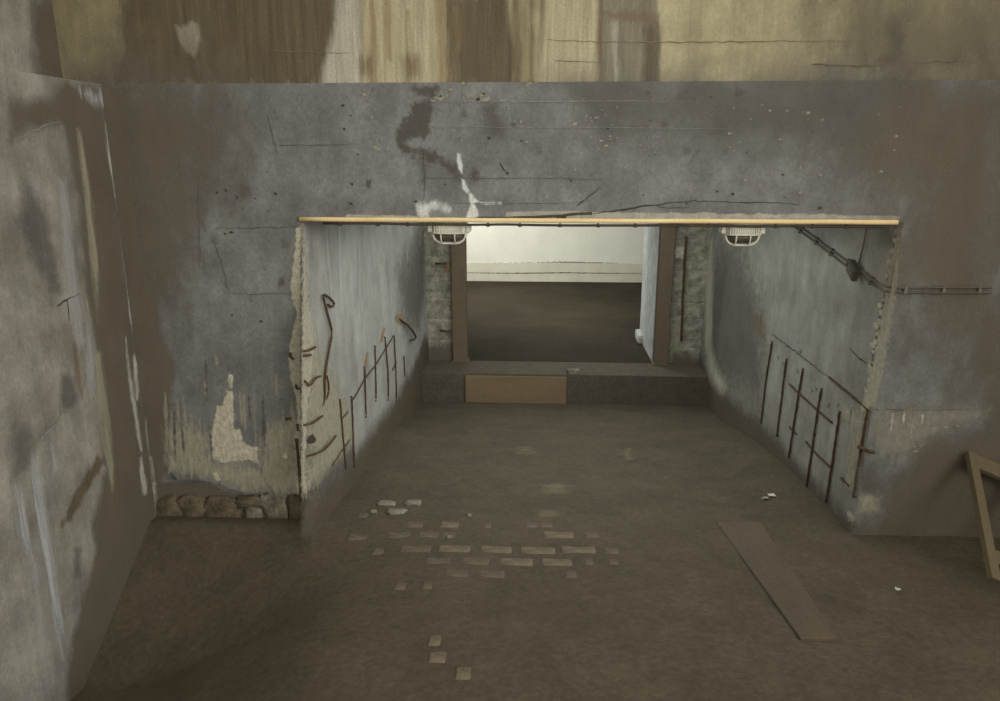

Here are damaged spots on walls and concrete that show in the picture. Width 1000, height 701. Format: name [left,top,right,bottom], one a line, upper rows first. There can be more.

water stain [11,0,520,701]
peeling [164,227,406,501]
crack [578,187,796,214]
spalling [581,203,903,524]